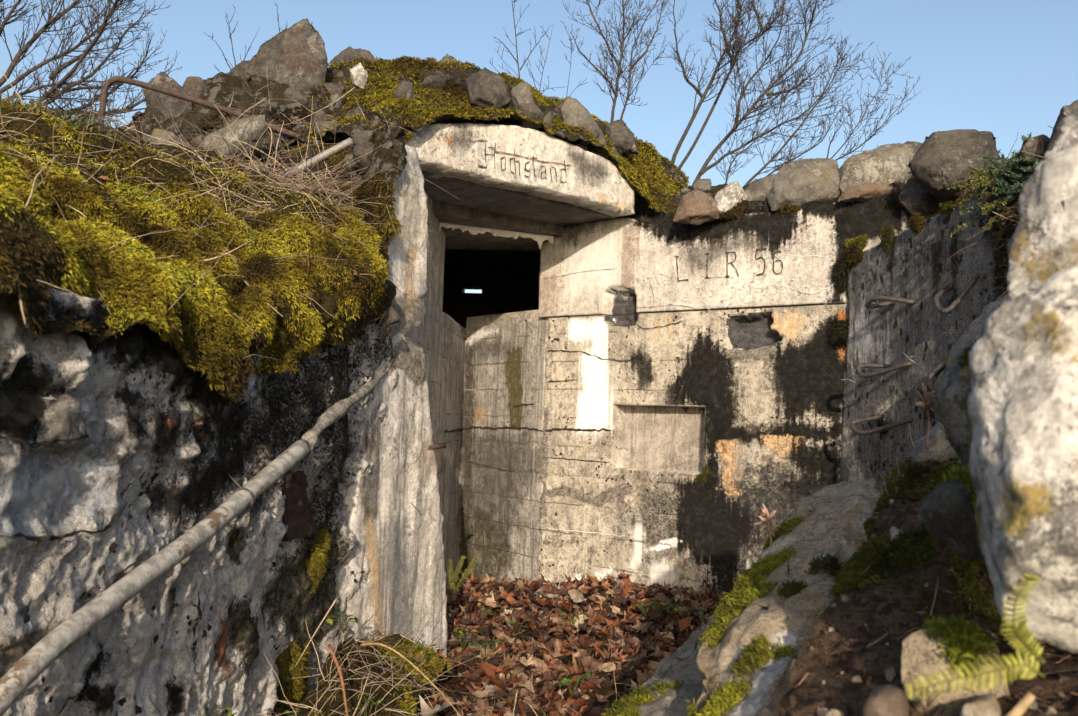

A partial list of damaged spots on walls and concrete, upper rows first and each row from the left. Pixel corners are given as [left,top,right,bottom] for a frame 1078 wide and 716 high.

crack [546,273,827,362]
leakage [797,315,822,338]
crack [445,403,612,463]